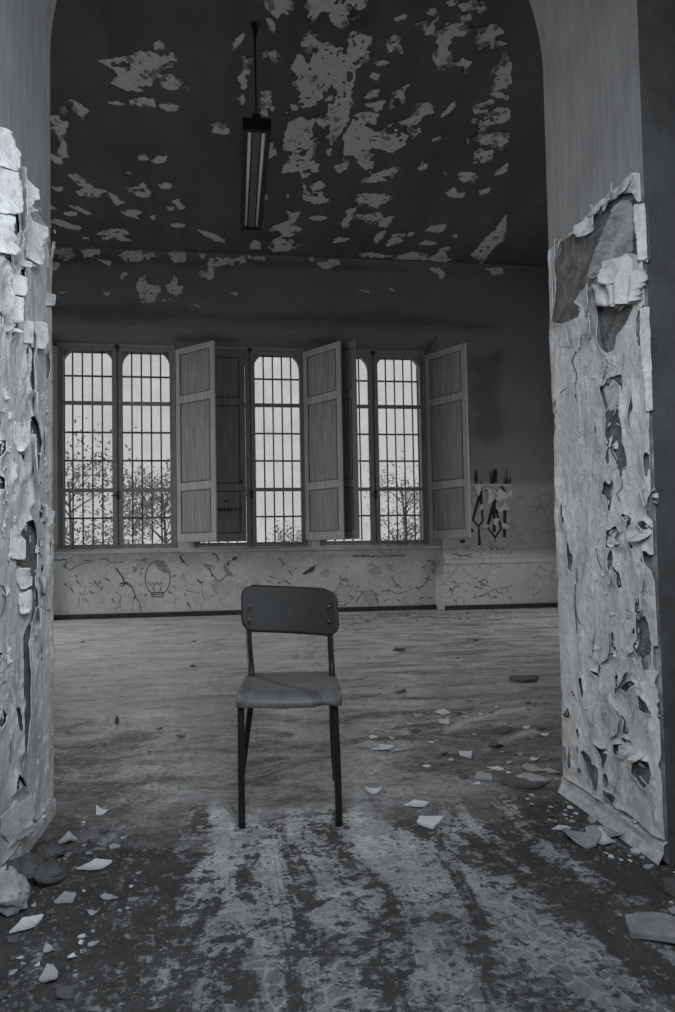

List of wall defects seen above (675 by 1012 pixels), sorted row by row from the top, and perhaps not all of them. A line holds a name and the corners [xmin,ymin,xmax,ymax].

peeling [99,40,190,112]
peeling [197,0,512,280]
peeling [0,100,186,867]
peeling [474,485,513,529]
peeling [548,172,665,841]
crack [39,538,144,611]
crack [179,553,226,609]
peeling [302,566,331,578]
crack [338,546,513,606]
crack [565,543,604,658]